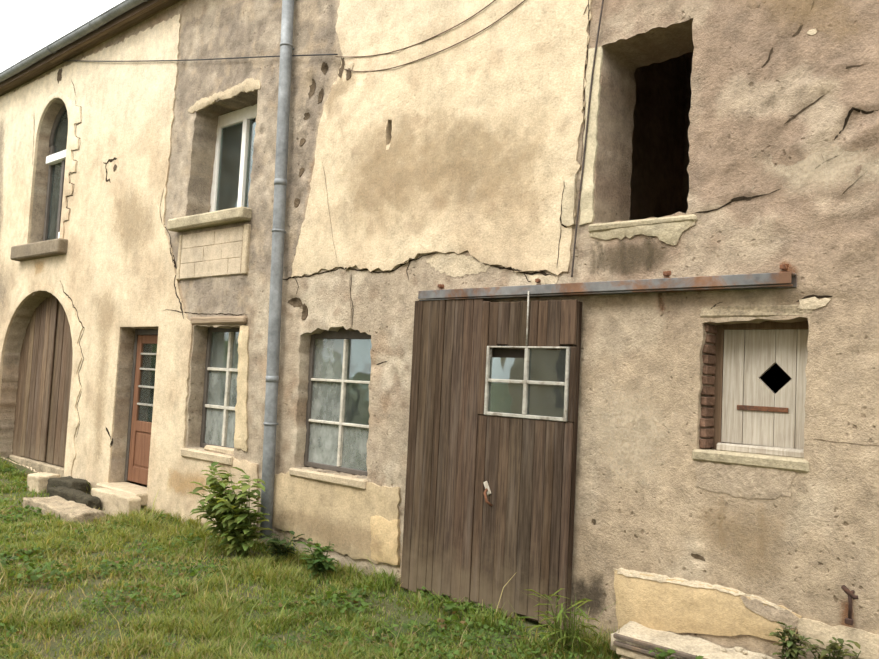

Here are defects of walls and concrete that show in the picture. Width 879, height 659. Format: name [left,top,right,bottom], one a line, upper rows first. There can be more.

spalling [308,57,354,104]
crack [581,0,590,159]
crack [812,107,878,171]
crack [283,162,437,332]
crack [491,189,567,282]
spalling [589,221,696,246]
crack [692,189,779,214]
crack [60,281,85,437]
flaking render [613,568,879,659]